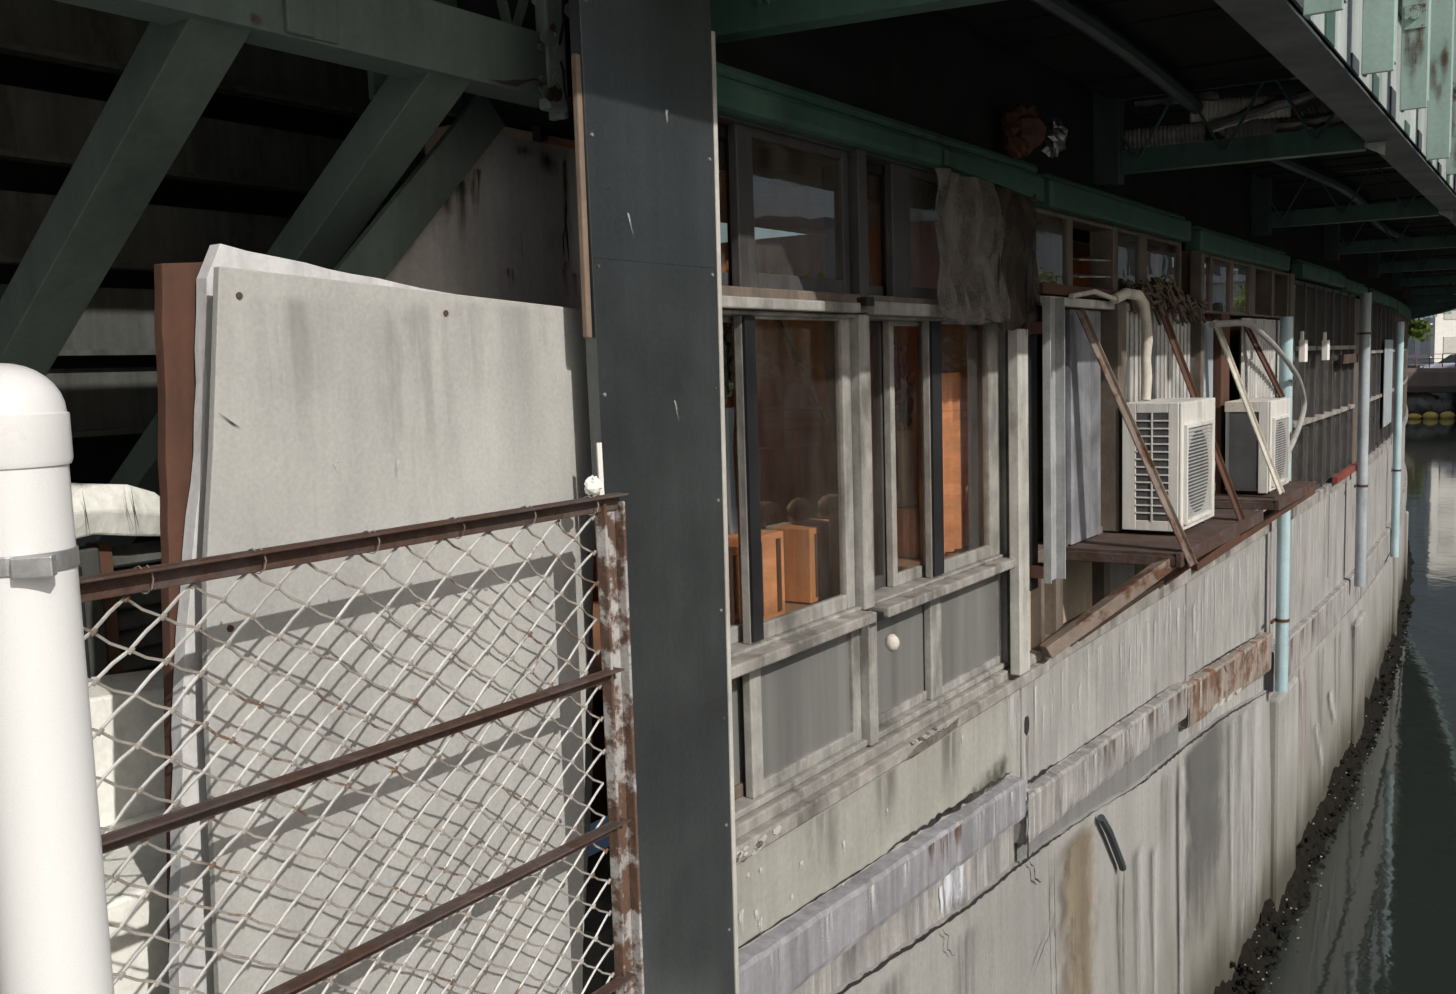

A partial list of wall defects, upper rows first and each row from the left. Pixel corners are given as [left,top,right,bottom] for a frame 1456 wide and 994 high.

corrosion [1406,28,1448,96]
corrosion [1173,669,1221,702]
damp [1066,832,1093,994]